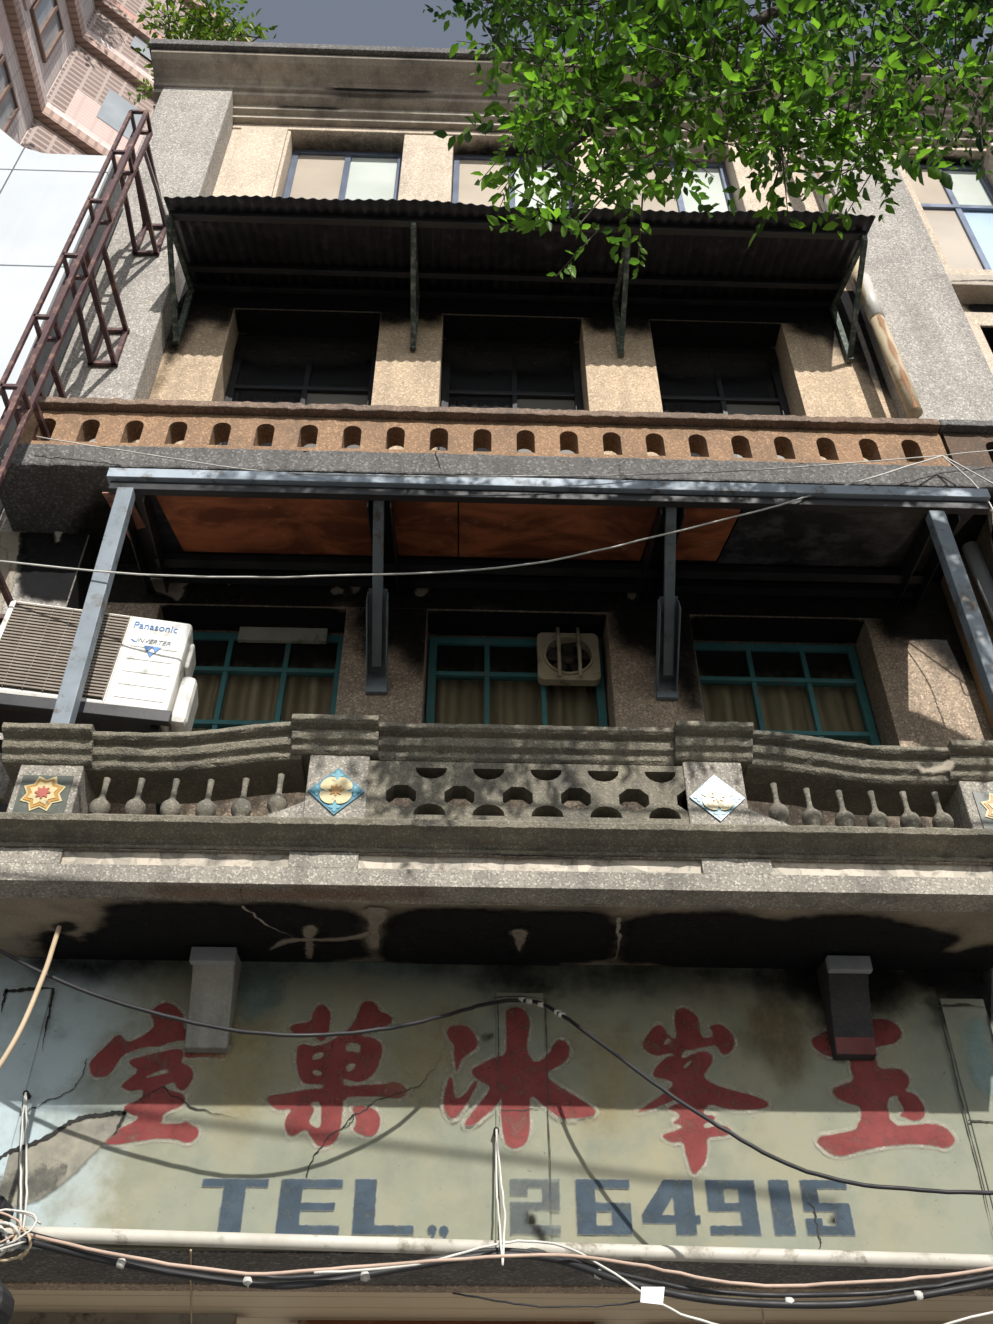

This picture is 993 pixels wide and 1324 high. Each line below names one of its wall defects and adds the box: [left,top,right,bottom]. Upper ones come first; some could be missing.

crack [1,987,55,1050]
leakage [936,992,993,1023]
crack [0,1058,233,1160]